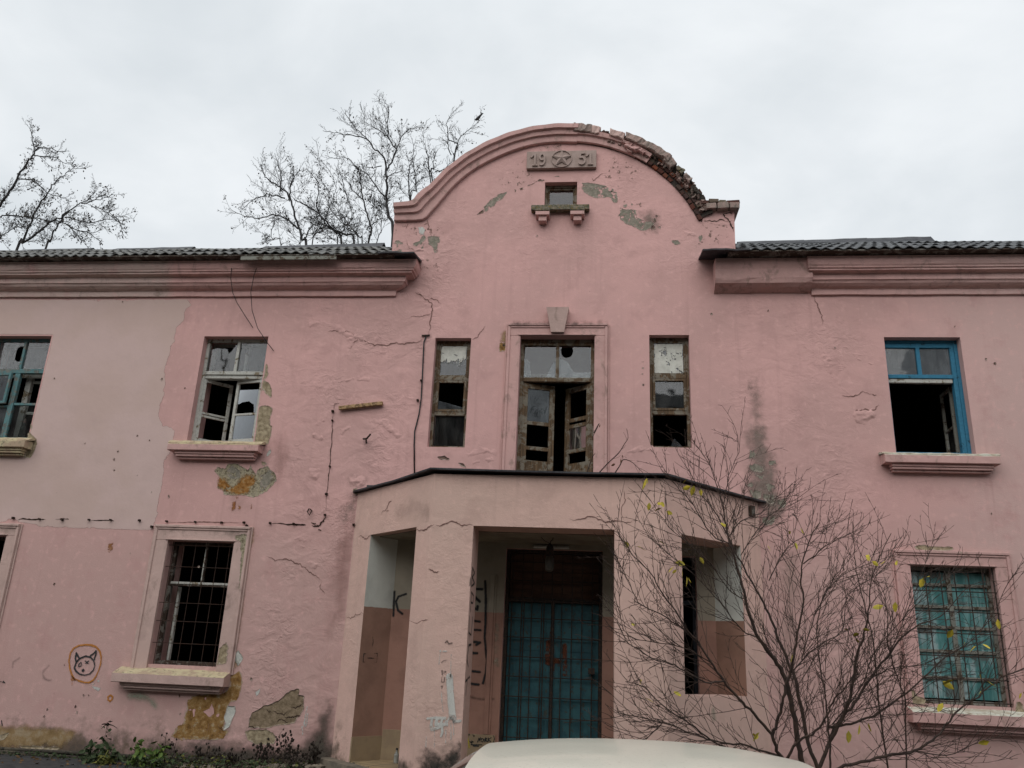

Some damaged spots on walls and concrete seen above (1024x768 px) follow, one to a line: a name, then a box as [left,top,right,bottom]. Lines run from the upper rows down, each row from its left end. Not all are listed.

peeling [477,174,559,215]
flaking render [582,144,740,244]
crack [330,293,439,347]
flaking render [215,364,277,510]
water stain [747,430,786,525]
crack [269,557,324,592]
flaking render [171,650,252,741]
spalling [245,689,304,745]